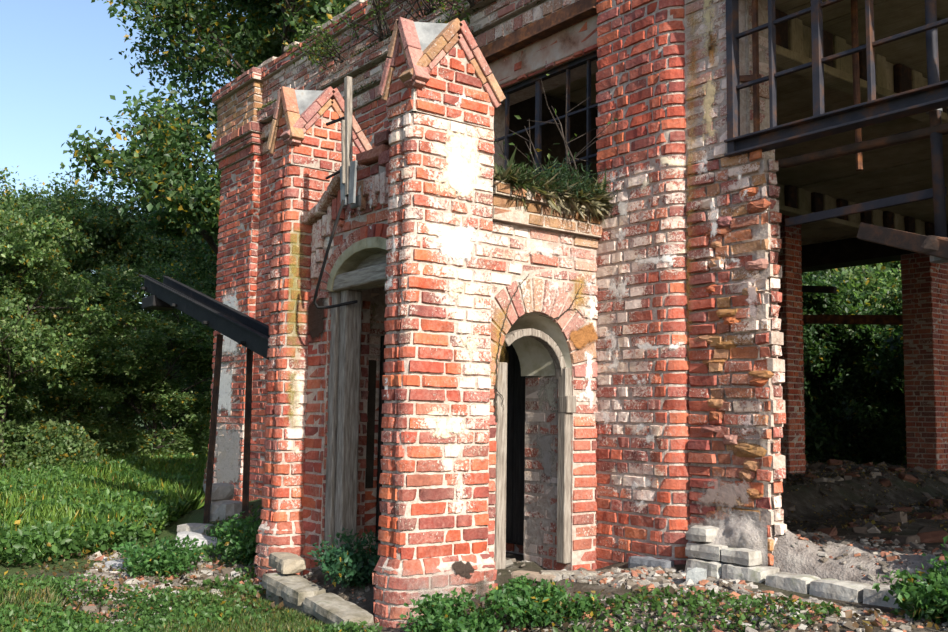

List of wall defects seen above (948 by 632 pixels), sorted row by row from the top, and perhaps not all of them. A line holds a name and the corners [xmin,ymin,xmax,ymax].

peeling [435,129,482,197]
spalling [738,173,772,214]
peeling [434,223,475,263]
spalling [703,201,769,327]
crack [495,274,584,422]
spalling [637,334,738,368]
spalling [748,370,775,387]
spalling [698,398,767,520]